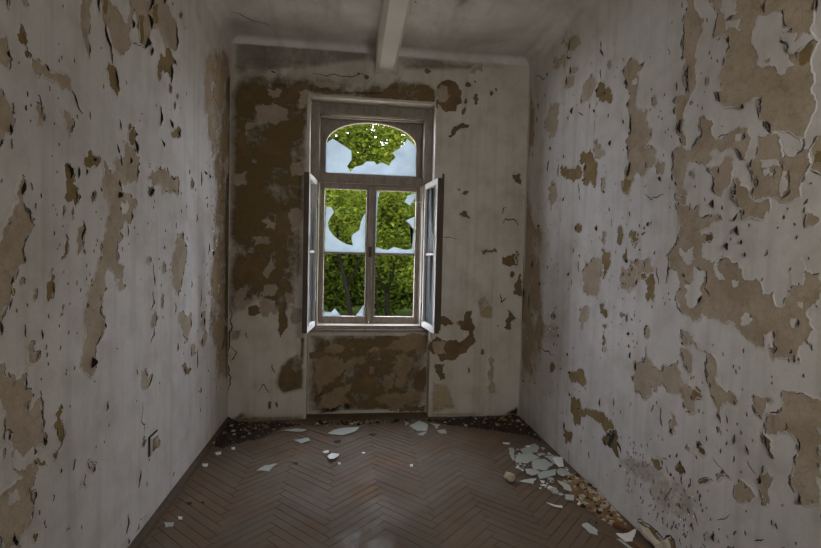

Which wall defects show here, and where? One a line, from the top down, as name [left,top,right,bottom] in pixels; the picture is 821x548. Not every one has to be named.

peeling [0,22,83,139]
peeling [536,34,614,150]
peeling [0,174,65,336]
peeling [60,120,180,379]
peeling [146,223,214,376]
peeling [426,309,496,394]
peeling [547,138,611,211]
peeling [567,0,821,436]
peeling [0,325,66,548]
peeling [550,361,621,467]
peeling [651,436,707,502]
peeling [697,388,821,508]